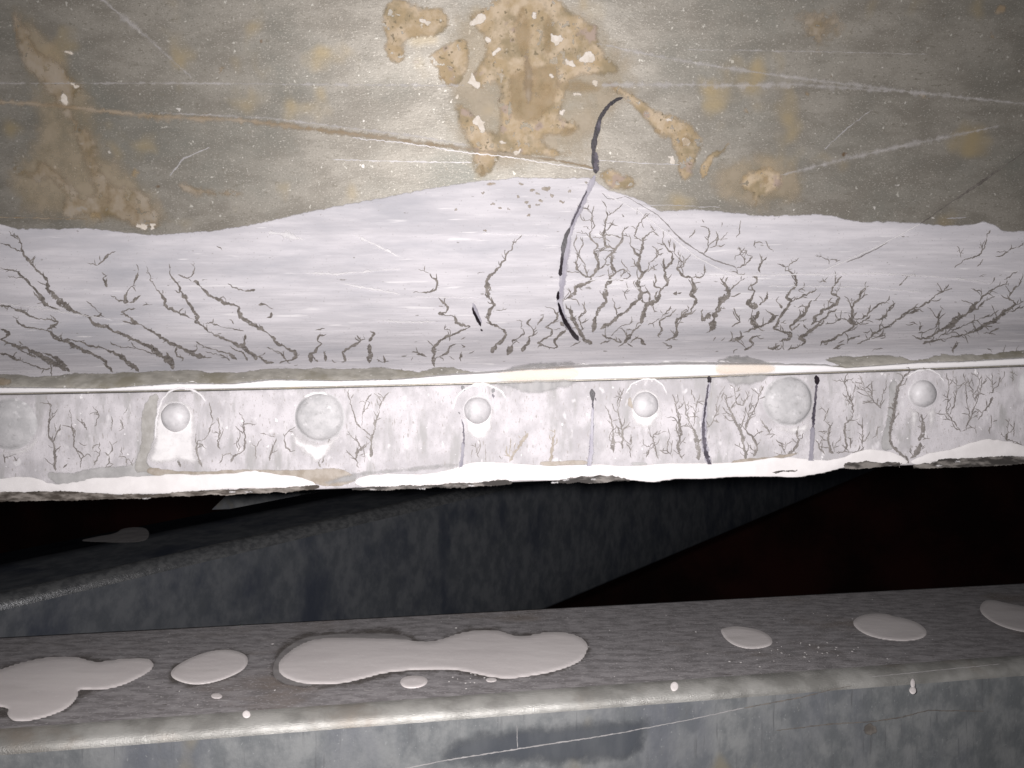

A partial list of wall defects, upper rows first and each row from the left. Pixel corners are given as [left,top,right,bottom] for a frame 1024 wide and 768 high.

water stain [14,16,159,230]
peeling [517,183,571,216]
crack [0,201,1024,471]
water stain [273,630,416,666]
water stain [311,671,404,687]